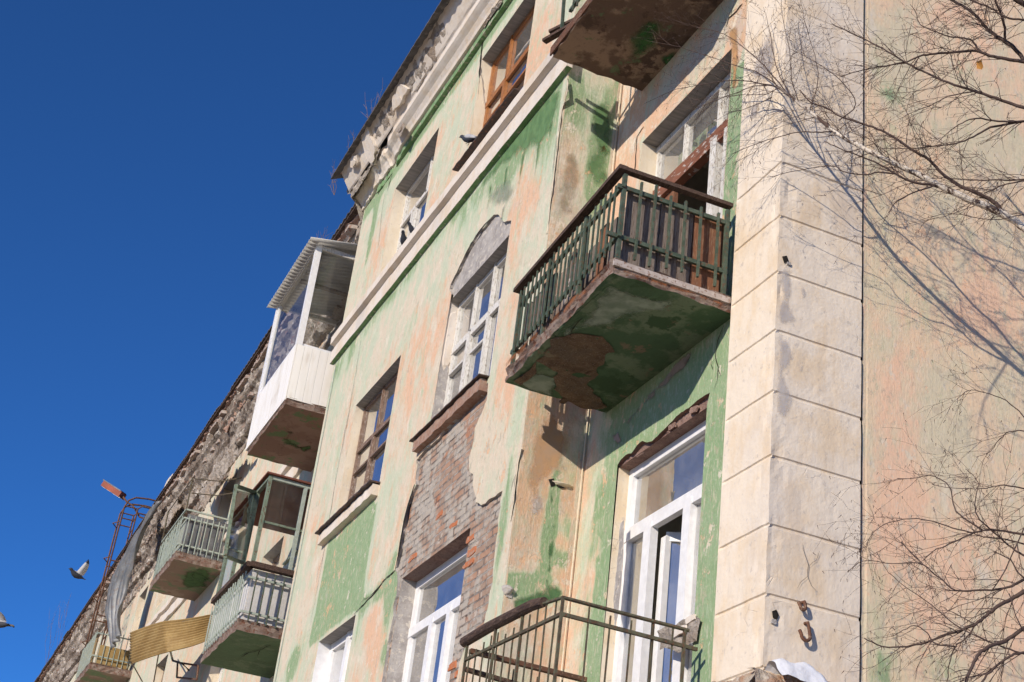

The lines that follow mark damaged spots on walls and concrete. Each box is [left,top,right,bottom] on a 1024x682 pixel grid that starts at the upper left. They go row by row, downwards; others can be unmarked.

spalling [347,22,446,197]
water stain [483,92,559,210]
spalling [514,288,669,409]
spalling [156,497,183,533]
spalling [198,443,246,512]
crack [352,484,415,616]
peeling [462,534,477,570]